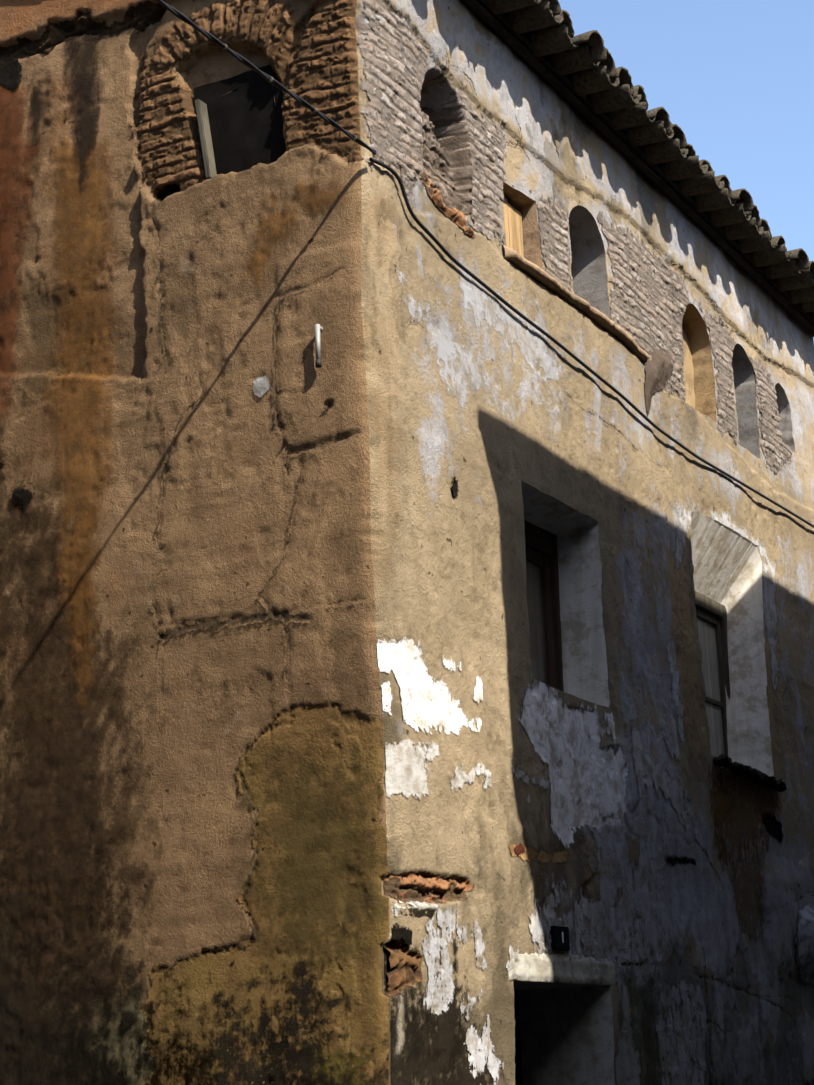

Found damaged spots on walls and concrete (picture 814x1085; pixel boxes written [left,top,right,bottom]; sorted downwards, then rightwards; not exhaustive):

damp [64,32,102,192]
flaking render [0,0,508,247]
damp [0,79,43,419]
damp [0,473,155,1085]
crack [150,212,366,974]
flaking render [96,636,504,1085]
flaking render [504,945,519,972]
flaking render [509,679,708,1085]
flaking render [666,638,684,742]
flaking render [674,502,695,572]
flaking render [710,511,778,692]